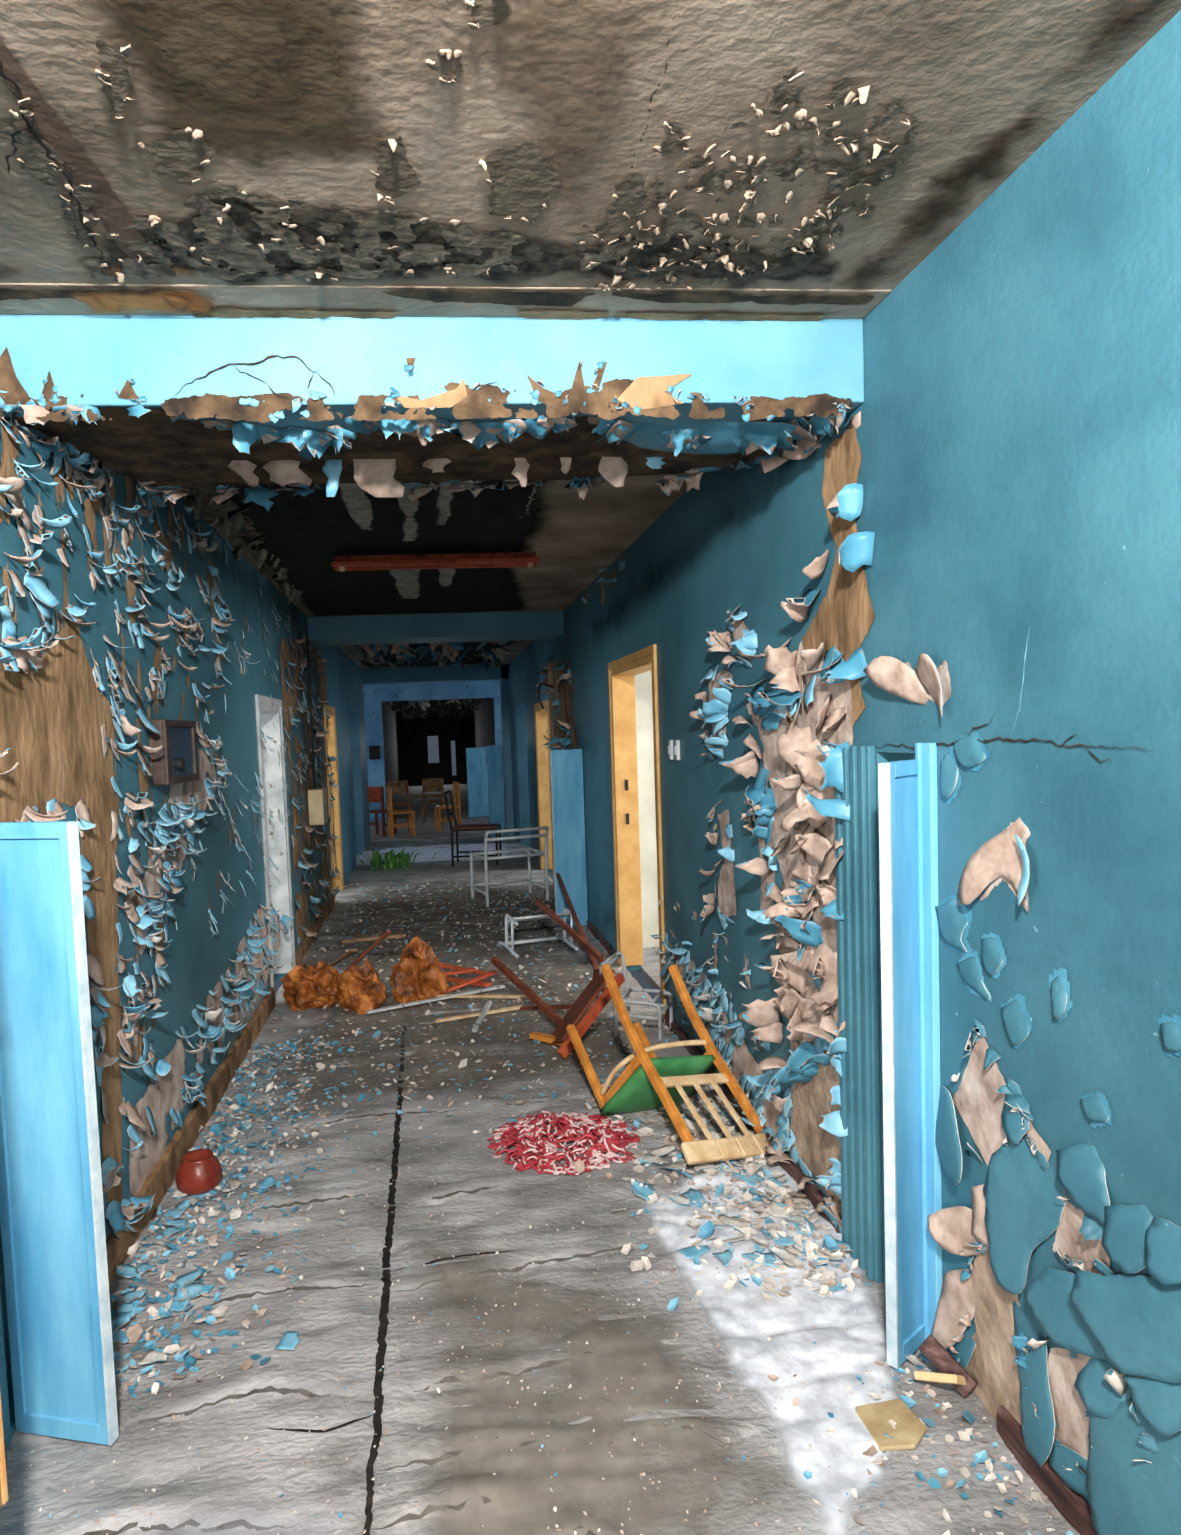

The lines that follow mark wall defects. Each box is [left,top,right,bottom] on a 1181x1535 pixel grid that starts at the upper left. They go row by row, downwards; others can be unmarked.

water stain [102,0,381,163]
water stain [0,37,885,289]
flaking render [424,49,464,85]
peeling [0,71,920,321]
water stain [509,0,627,182]
water stain [903,115,1036,241]
water stain [1091,0,1162,50]
crack [875,627,1148,763]
peeling [0,347,951,1240]
peeling [958,817,1030,912]
crack [267,1007,519,1535]
peeling [927,1019,1181,1535]